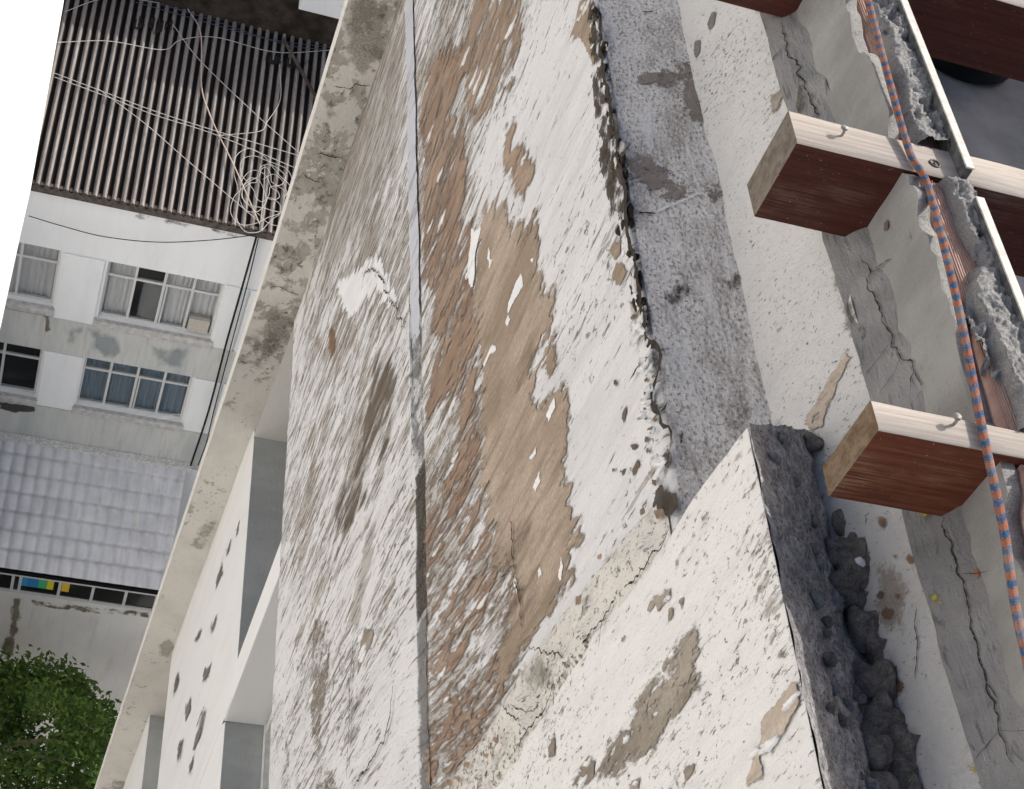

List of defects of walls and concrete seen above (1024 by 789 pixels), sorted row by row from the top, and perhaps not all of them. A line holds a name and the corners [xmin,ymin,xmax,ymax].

crack [772,23,819,118]
spalling [845,0,899,140]
crack [361,55,421,440]
peeling [417,0,585,789]
spalling [569,0,708,569]
crack [860,255,922,391]
spalling [904,173,996,427]
peeling [177,698,206,772]
crack [502,521,672,757]
peeling [568,620,703,789]
peeling [746,682,801,787]
crack [941,516,1024,761]